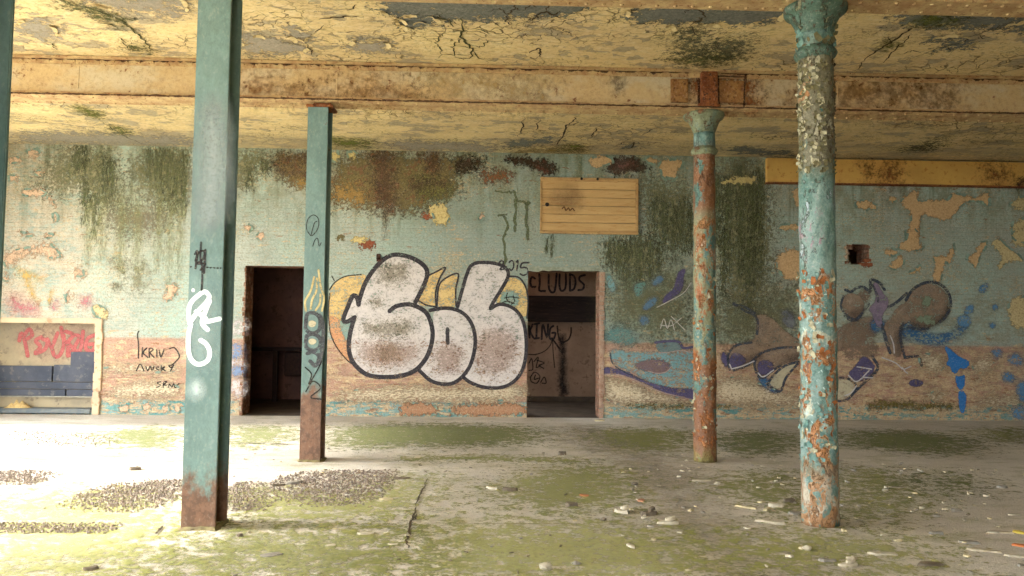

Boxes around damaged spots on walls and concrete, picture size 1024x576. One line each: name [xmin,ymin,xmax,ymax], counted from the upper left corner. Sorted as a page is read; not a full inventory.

peeling [14,14,68,45]
peeling [65,0,195,23]
peeling [241,22,319,58]
crack [434,5,572,60]
crack [517,116,664,149]
peeling [795,20,838,174]
peeling [2,147,66,286]
leakage [9,126,194,293]
leakage [330,135,571,265]
leakage [603,196,694,292]
peeling [854,189,1024,282]
crack [405,478,428,548]